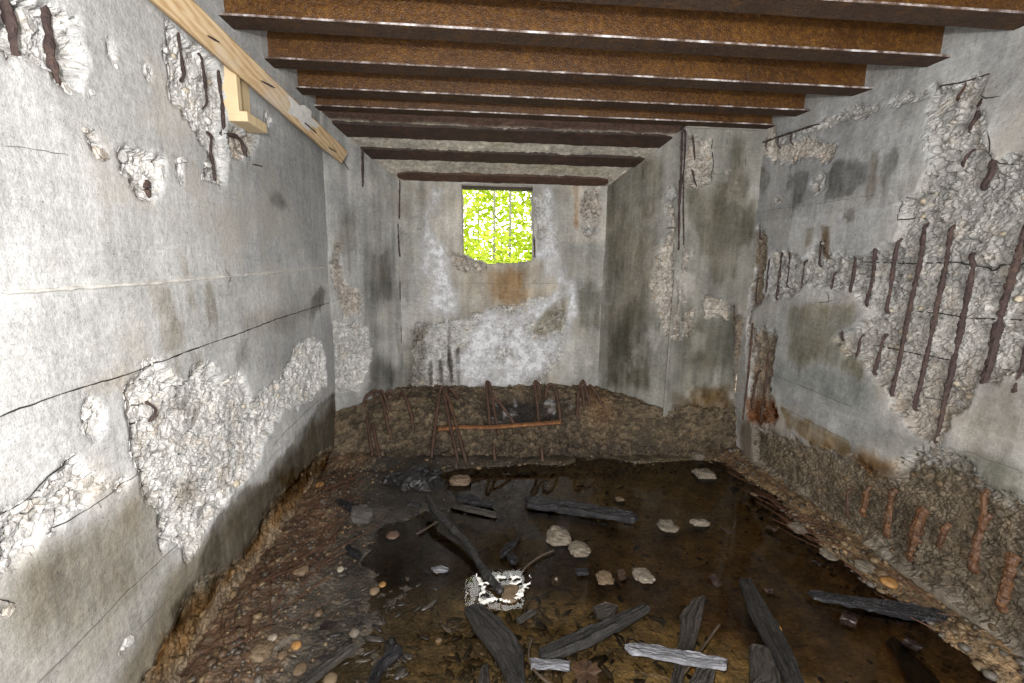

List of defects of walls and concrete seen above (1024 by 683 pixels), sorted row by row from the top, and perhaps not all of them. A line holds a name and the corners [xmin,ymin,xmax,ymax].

spalling [0,0,96,99]
spalling [161,18,272,186]
rust [677,127,697,250]
crack [0,303,328,417]
spalling [0,242,373,576]
spalling [409,295,572,388]
water stain [440,189,577,387]
spalling [648,73,1024,658]
rust [872,222,930,397]
rust [912,224,956,411]
rust [933,252,977,444]
rust [980,225,1024,384]